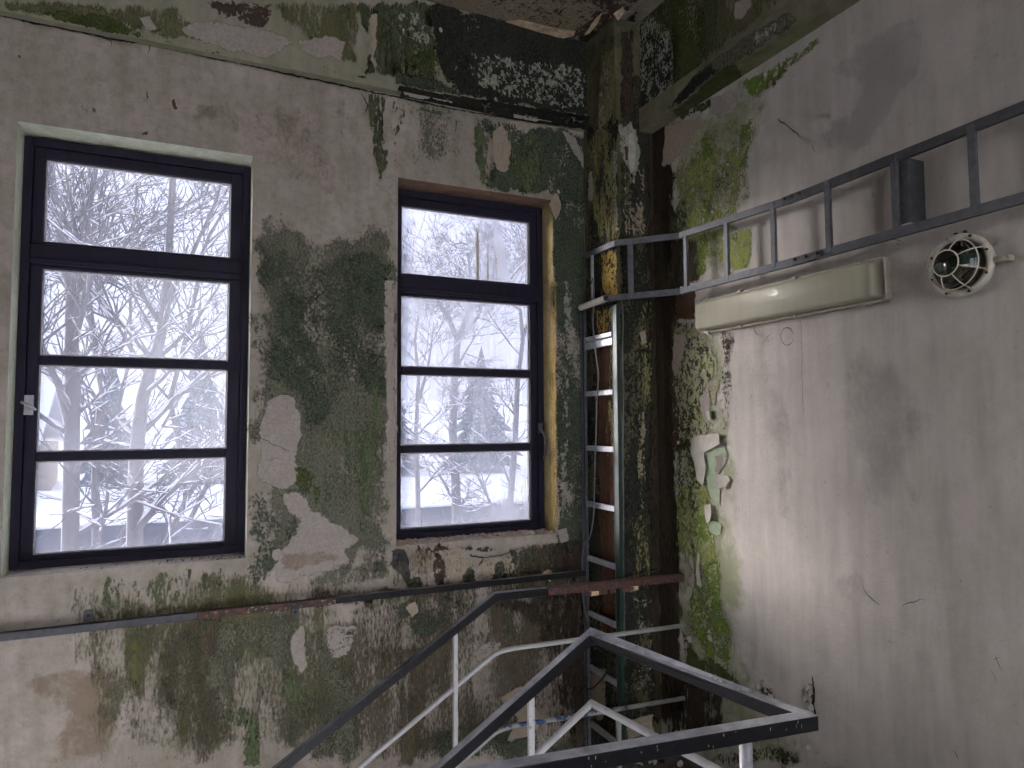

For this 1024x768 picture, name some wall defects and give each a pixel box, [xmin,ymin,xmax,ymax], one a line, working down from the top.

peeling [140,16,156,31]
peeling [179,1,346,60]
peeling [368,13,377,62]
leakage [5,0,795,766]
peeling [256,394,358,583]
peeling [669,318,733,649]
peeling [290,625,307,673]
peeling [325,625,357,658]